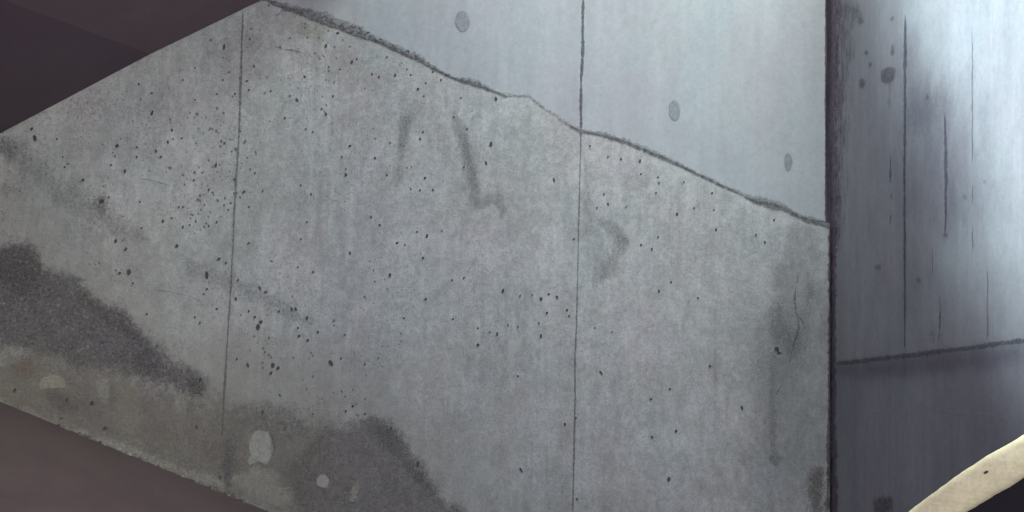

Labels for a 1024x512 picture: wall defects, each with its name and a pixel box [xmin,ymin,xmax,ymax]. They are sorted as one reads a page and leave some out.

water stain [0,244,202,394]